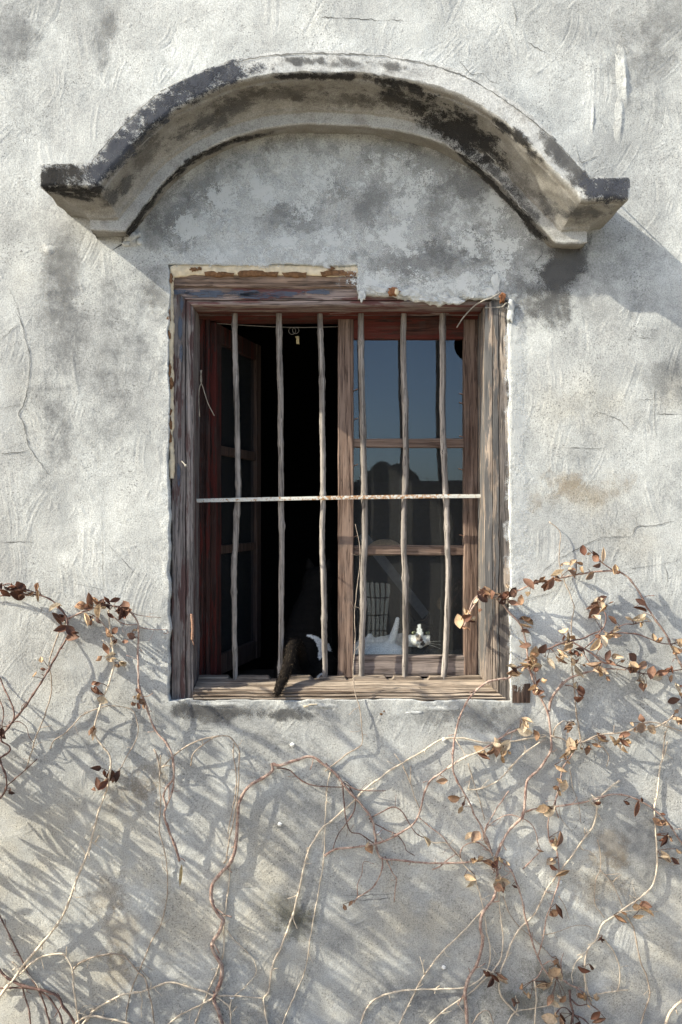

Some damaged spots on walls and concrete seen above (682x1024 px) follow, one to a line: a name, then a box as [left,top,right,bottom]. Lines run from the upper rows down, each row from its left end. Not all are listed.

crack [2,293,48,474]
leakage [40,50,630,327]
peeling [163,141,536,487]